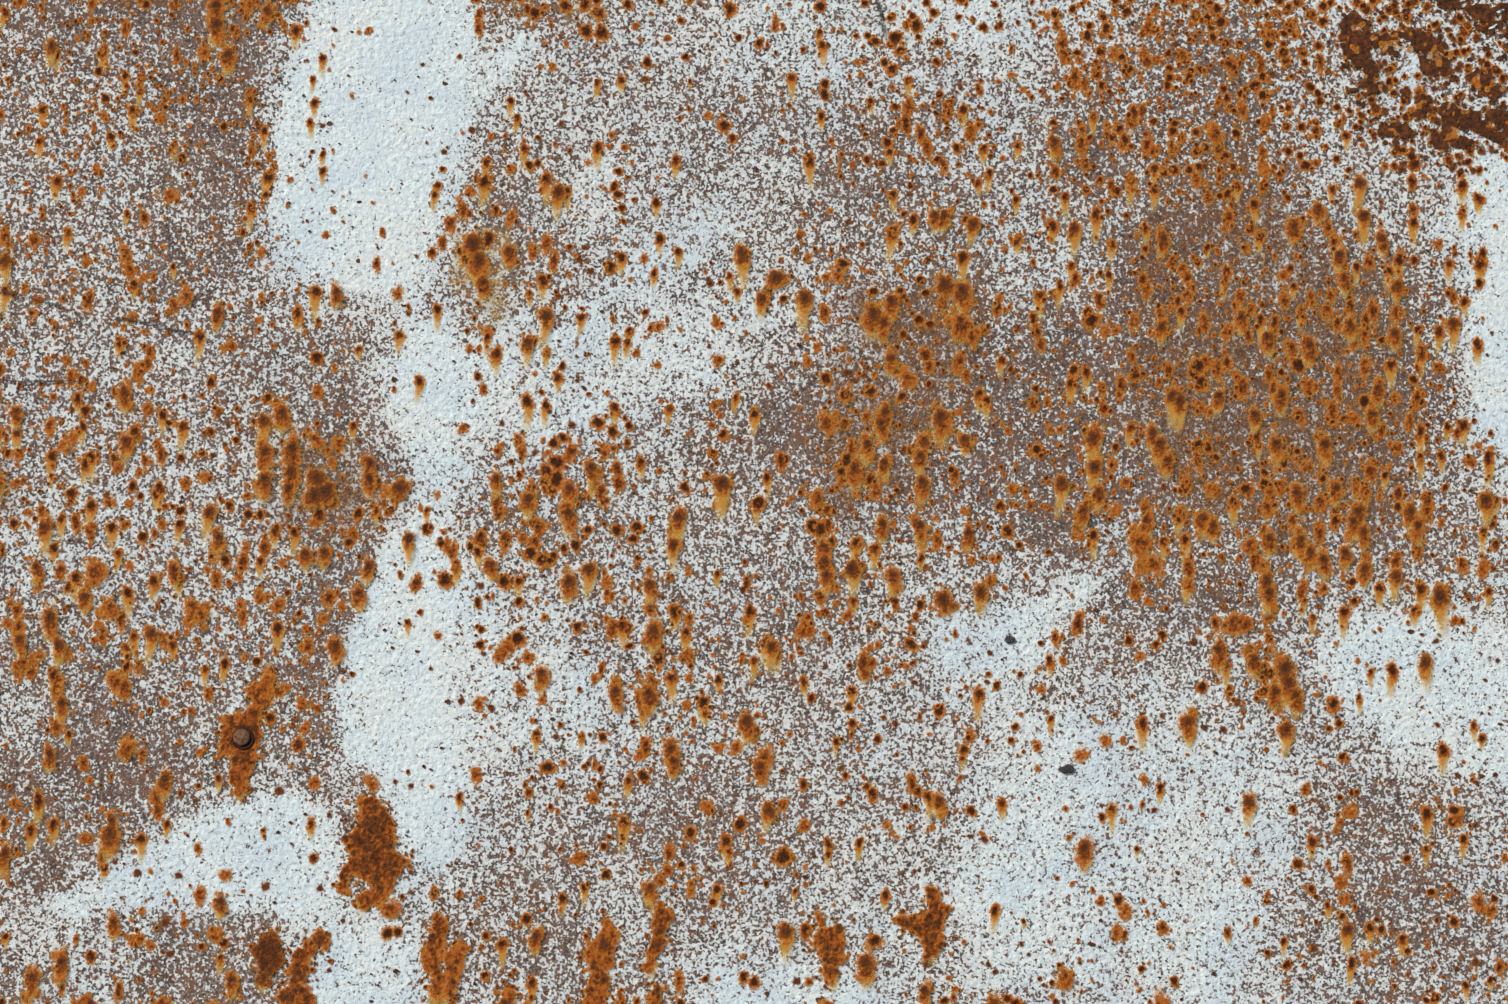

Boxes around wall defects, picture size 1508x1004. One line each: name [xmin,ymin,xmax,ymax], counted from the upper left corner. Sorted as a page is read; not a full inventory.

rust [376,363,441,397]
rust [390,0,1508,880]
rust [378,608,423,649]
rust [0,755,153,899]
rust [115,733,204,860]
rust [303,813,316,835]
rust [1032,832,1188,1004]
rust [1221,706,1508,1004]